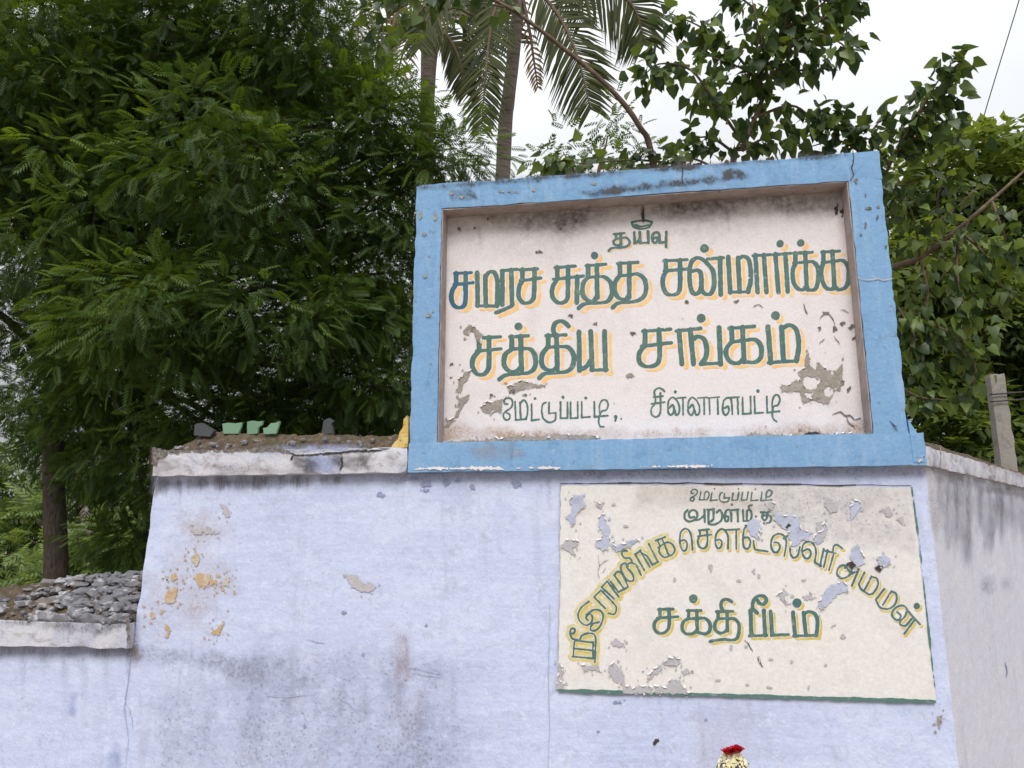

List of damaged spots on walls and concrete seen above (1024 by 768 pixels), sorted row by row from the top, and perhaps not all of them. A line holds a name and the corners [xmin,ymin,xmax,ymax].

peeling [460,324,484,344]
peeling [445,363,472,427]
peeling [477,378,547,420]
peeling [780,347,851,408]
crack [289,449,389,471]
peeling [560,492,644,559]
peeling [747,497,864,551]
peeling [124,503,237,647]
peeling [343,571,380,599]
peeling [776,543,897,616]
peeling [552,660,568,691]
peeling [577,638,694,704]